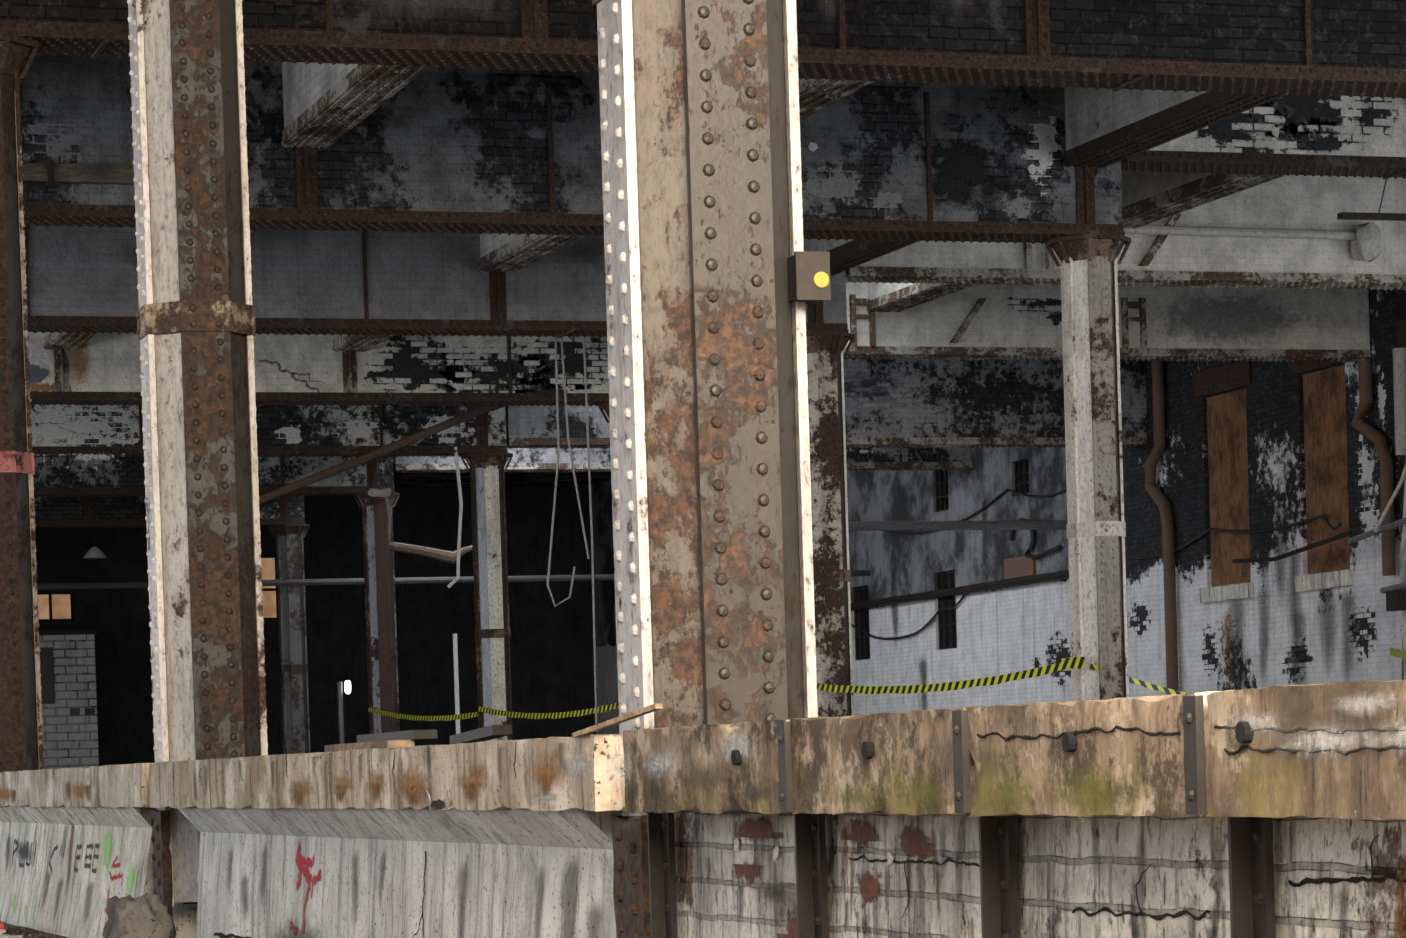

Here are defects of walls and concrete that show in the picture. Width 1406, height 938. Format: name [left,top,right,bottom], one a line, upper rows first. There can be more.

peeling [1197,94,1399,165]
peeling [364,335,609,407]
peeling [1128,601,1153,638]
peeling [1349,606,1378,662]
crack [977,725,1180,742]
crack [1214,725,1406,756]
rust [293,783,308,804]
rust [370,773,383,801]
rust [462,767,485,801]
rust [535,758,558,793]
crack [1288,835,1406,887]
crack [1072,864,1211,921]